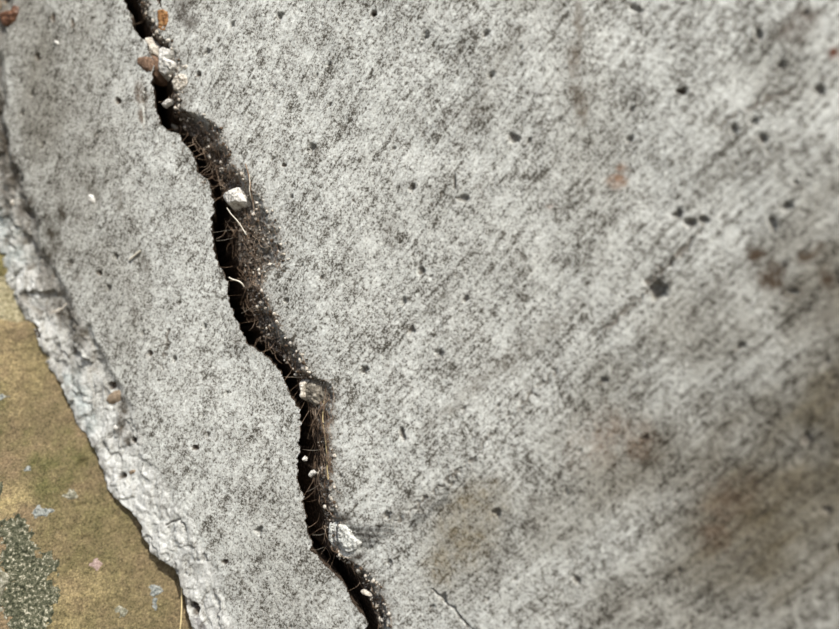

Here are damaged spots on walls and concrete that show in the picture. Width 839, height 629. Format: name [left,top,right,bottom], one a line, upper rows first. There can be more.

crack [123,0,379,629]